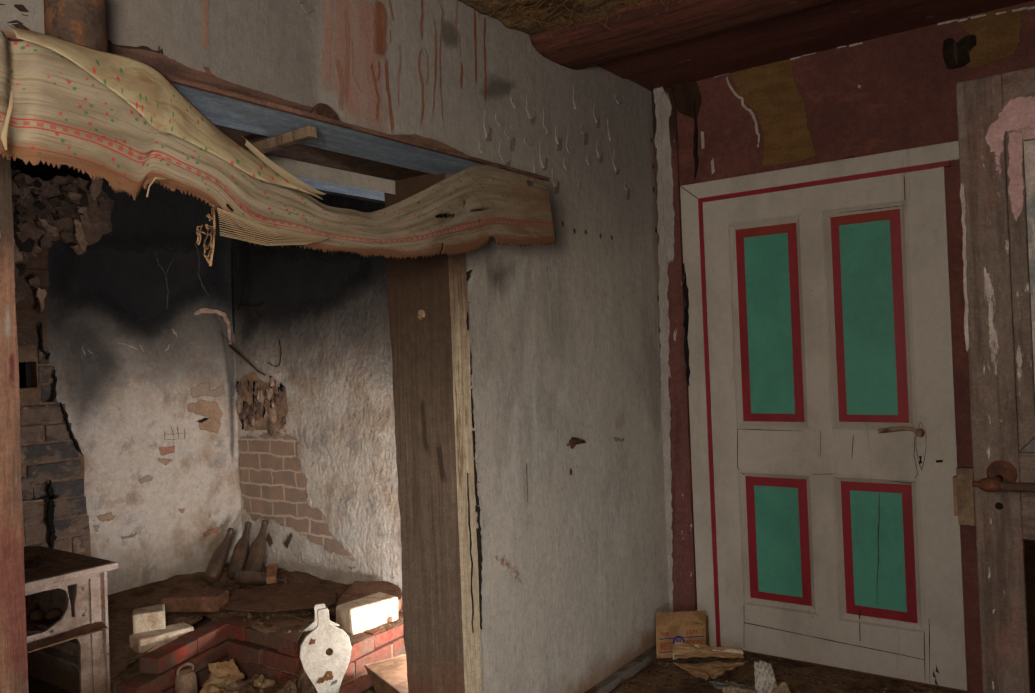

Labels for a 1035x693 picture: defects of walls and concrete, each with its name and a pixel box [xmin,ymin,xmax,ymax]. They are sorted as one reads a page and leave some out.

rust [371,0,401,130]
rust [418,0,487,123]
peeling [715,52,816,167]
peeling [937,6,1035,68]
flaking render [11,169,114,314]
flaking render [187,372,355,569]
crack [466,312,483,629]
spalling [567,437,586,449]